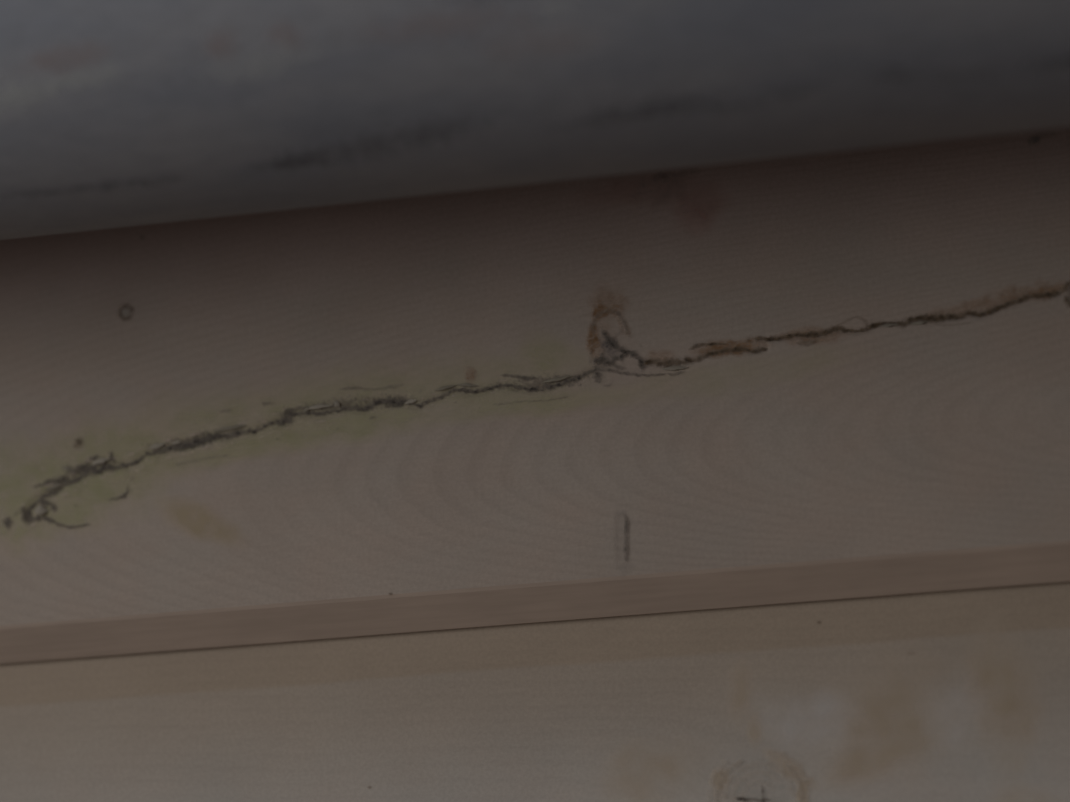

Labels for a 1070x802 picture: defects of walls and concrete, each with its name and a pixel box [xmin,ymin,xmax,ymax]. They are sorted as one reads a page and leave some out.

crack [644,291,1060,374]
crack [5,369,596,528]